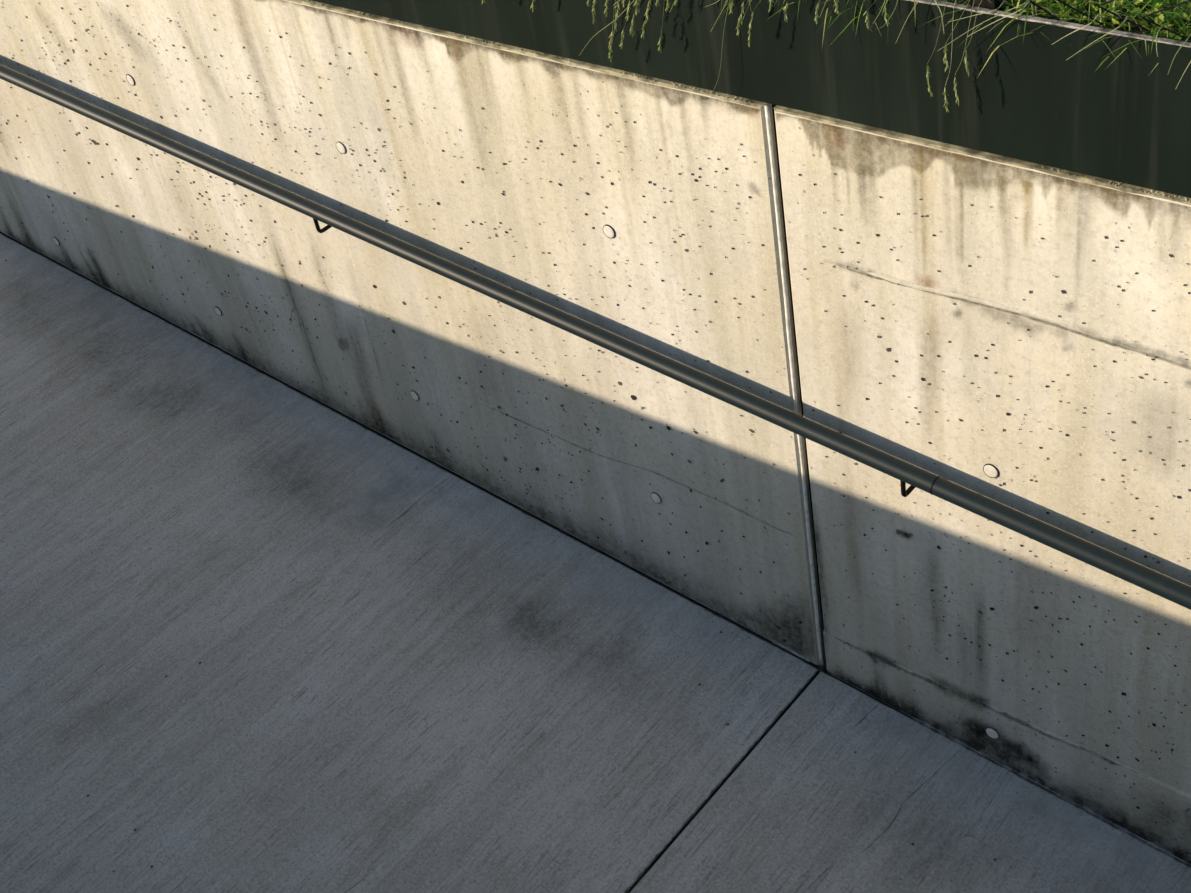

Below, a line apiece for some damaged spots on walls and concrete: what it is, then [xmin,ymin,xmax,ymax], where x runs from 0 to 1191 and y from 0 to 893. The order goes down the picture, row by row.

damp [442,36,469,60]
damp [802,119,896,172]
damp [910,144,1056,186]
damp [1090,184,1154,210]
crack [1013,313,1115,346]
damp [967,721,1039,769]